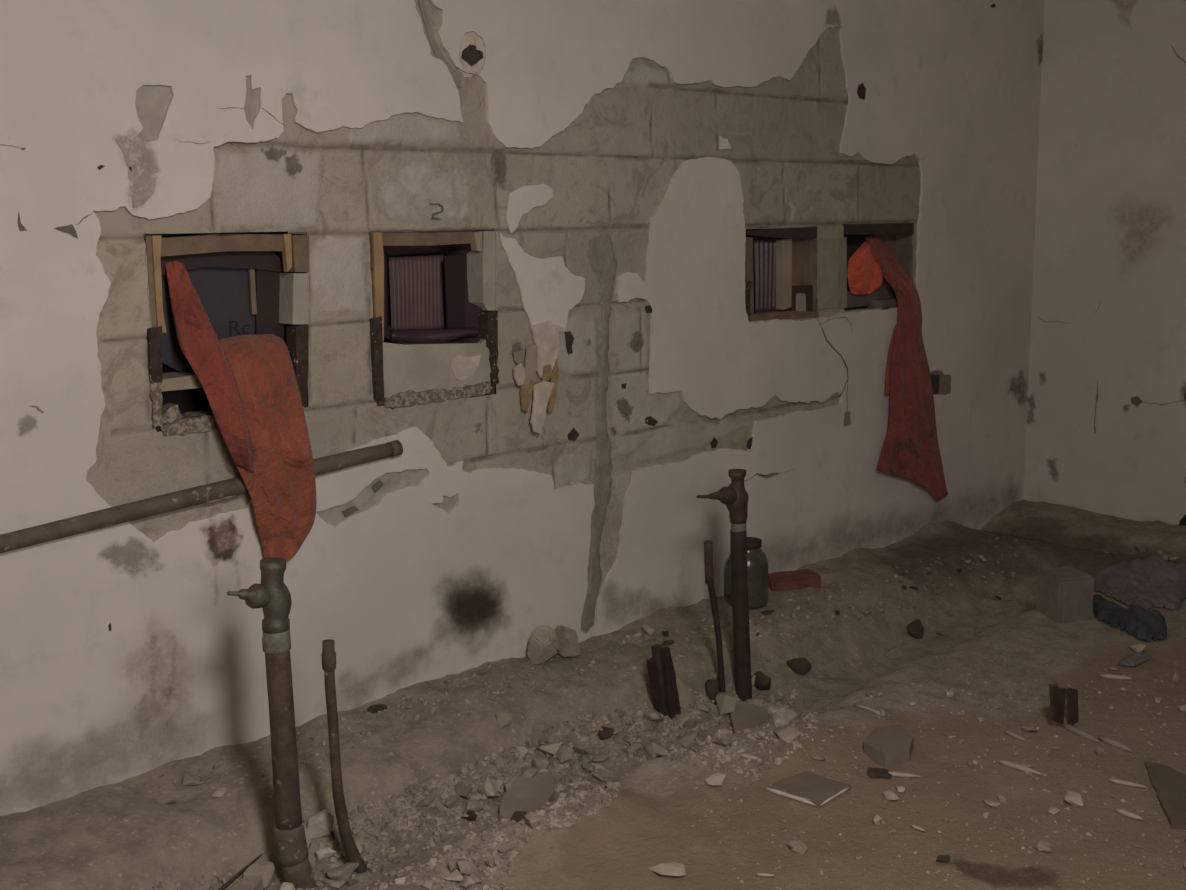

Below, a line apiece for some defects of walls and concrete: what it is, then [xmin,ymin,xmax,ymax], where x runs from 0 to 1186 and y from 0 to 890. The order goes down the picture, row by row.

flaking render [86,0,921,634]
crack [744,469,794,482]
rust [209,519,239,560]